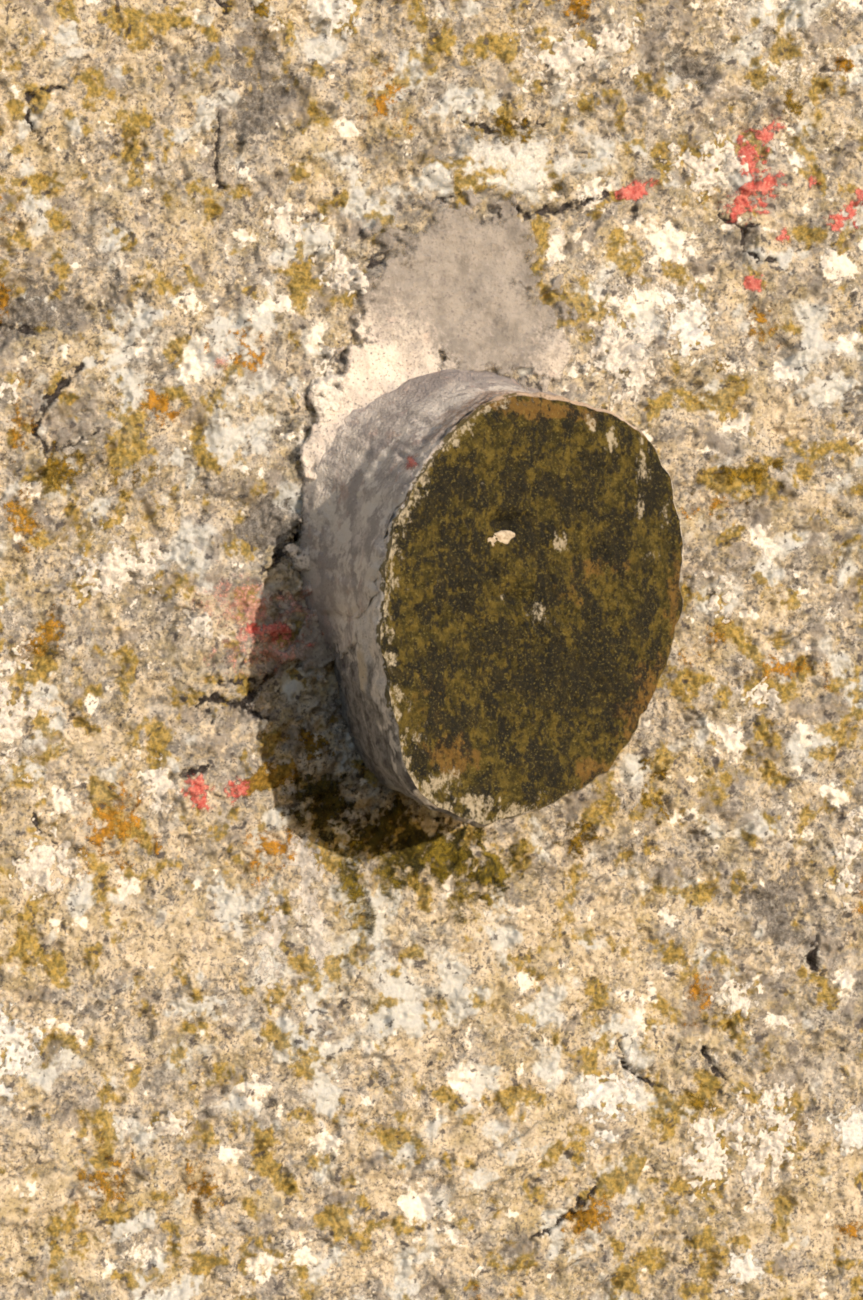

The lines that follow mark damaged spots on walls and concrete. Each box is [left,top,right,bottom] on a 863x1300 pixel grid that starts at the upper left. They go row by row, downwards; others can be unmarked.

crack [215,0,232,15]
crack [209,112,225,189]
crack [30,362,96,453]
water stain [232,723,529,1003]